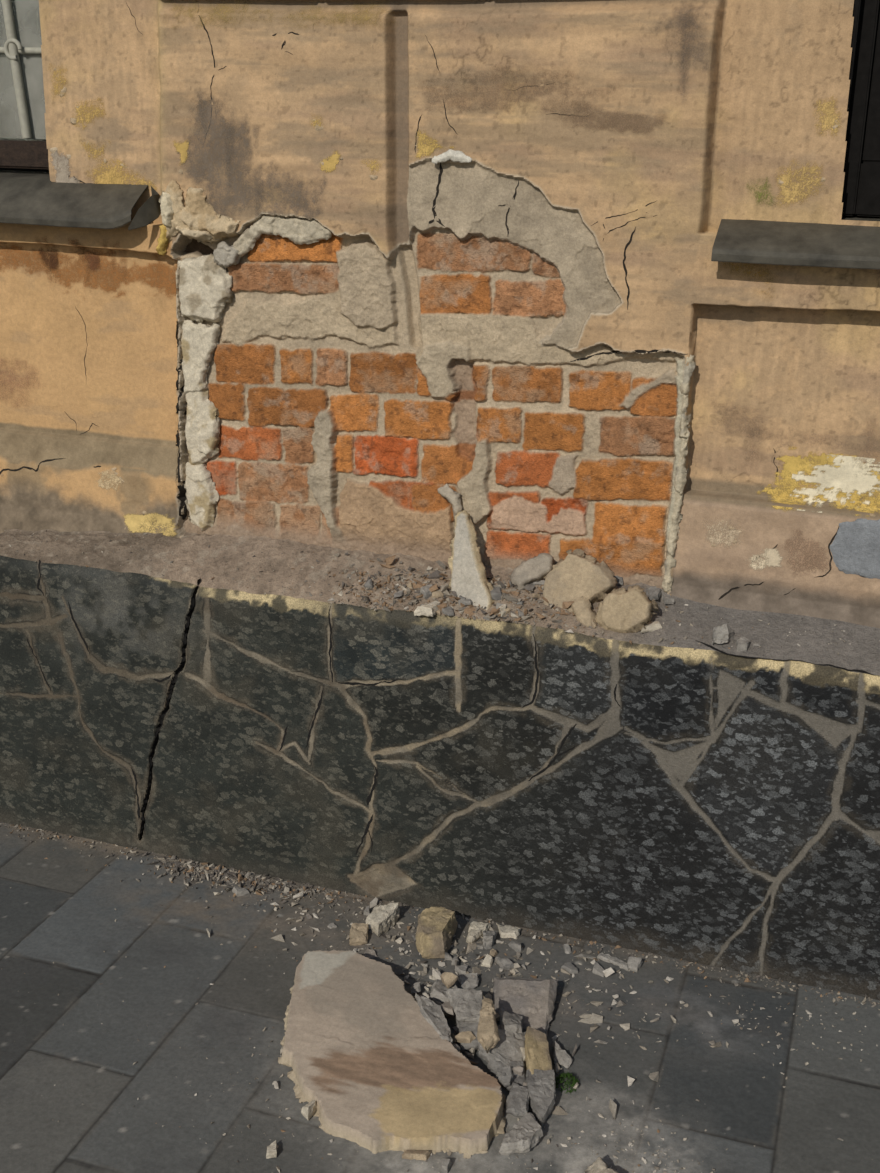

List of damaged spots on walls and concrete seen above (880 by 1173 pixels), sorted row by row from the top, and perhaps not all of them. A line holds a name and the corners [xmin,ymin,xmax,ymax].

crack [591,201,657,310]
spalling [124,131,696,594]
crack [0,458,64,474]
peeling [757,447,880,517]
crack [131,578,201,840]